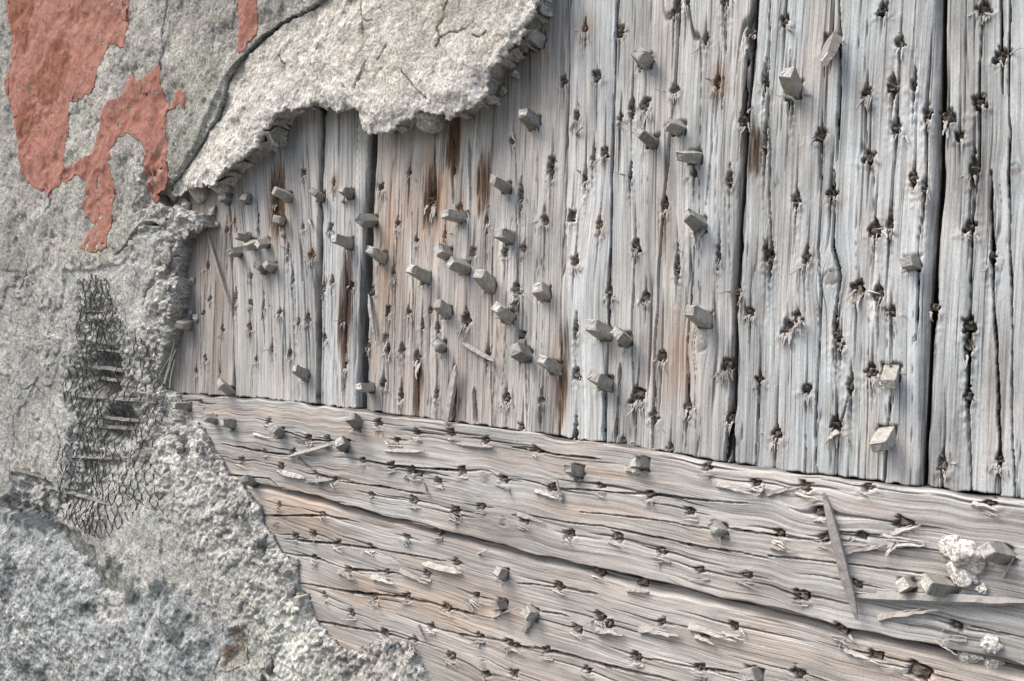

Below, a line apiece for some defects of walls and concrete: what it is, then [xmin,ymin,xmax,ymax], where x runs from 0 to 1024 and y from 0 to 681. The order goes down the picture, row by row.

peeling [4,0,186,253]
peeling [236,0,258,54]
flaking render [10,276,166,521]
flaking render [218,623,250,672]